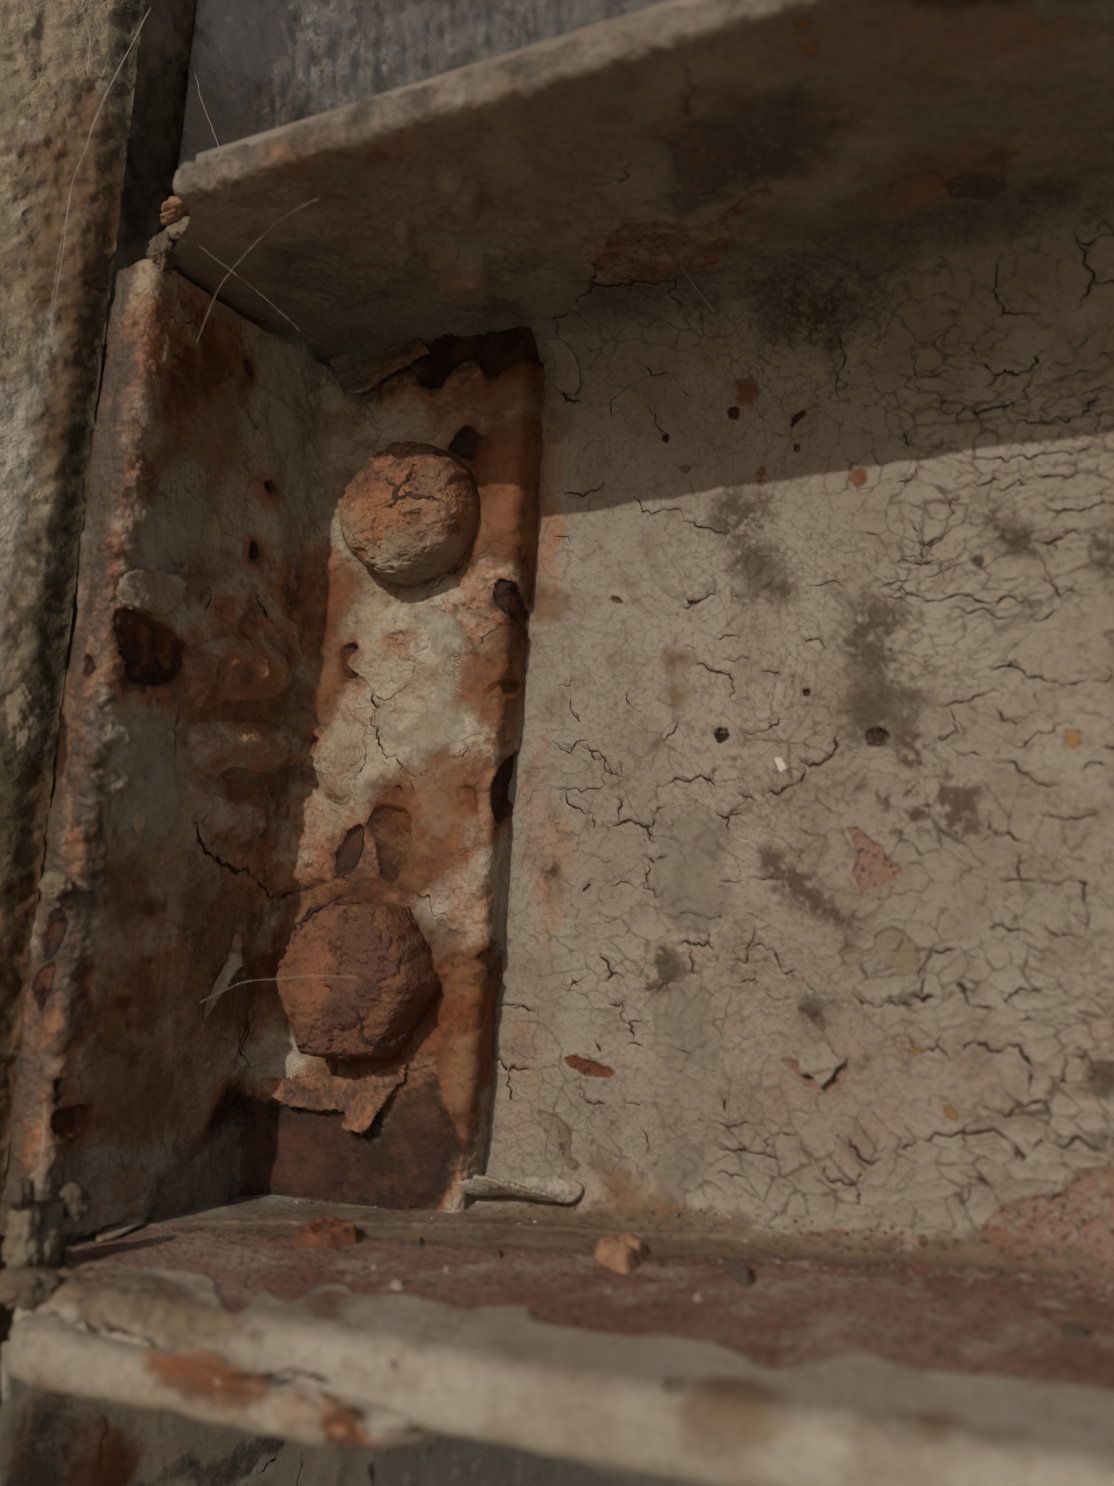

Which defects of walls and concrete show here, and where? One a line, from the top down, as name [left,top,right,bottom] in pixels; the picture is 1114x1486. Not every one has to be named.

rust [451,414,544,604]
crack [565,482,734,537]
crack [862,234,1114,622]
rust [309,564,358,712]
rust [453,626,527,739]
crack [685,634,780,696]
rust [270,752,499,1128]
crack [555,680,840,1053]
crack [823,660,1114,1205]
crack [494,1058,530,1100]
peeling [65,1166,1114,1390]
rust [153,1352,263,1404]